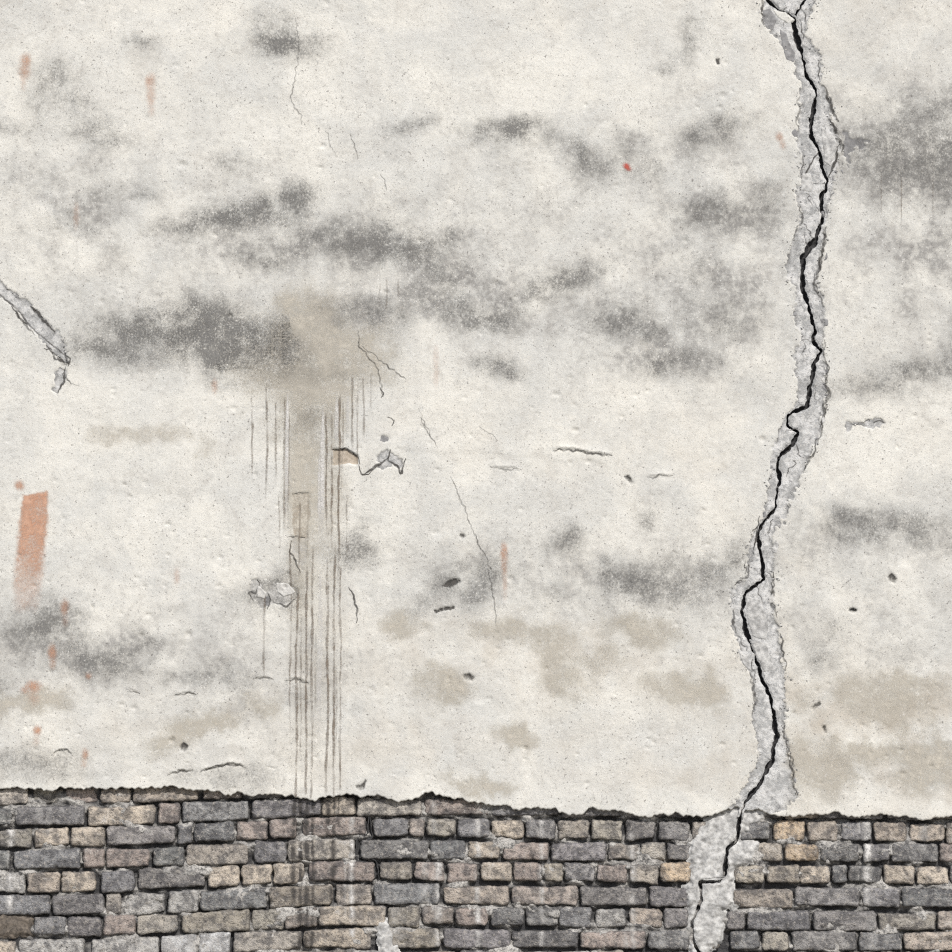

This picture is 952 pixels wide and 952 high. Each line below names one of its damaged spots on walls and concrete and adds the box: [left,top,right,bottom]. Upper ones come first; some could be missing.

damp [858,106,952,188]
damp [174,185,310,232]
damp [303,223,392,260]
crack [0,282,71,381]
damp [449,301,510,332]
damp [607,309,658,339]
spalling [331,435,406,476]
crack [681,0,870,952]
rust [16,482,48,576]
spalling [248,579,298,609]
damp [76,291,394,947]
spalling [0,914,35,938]